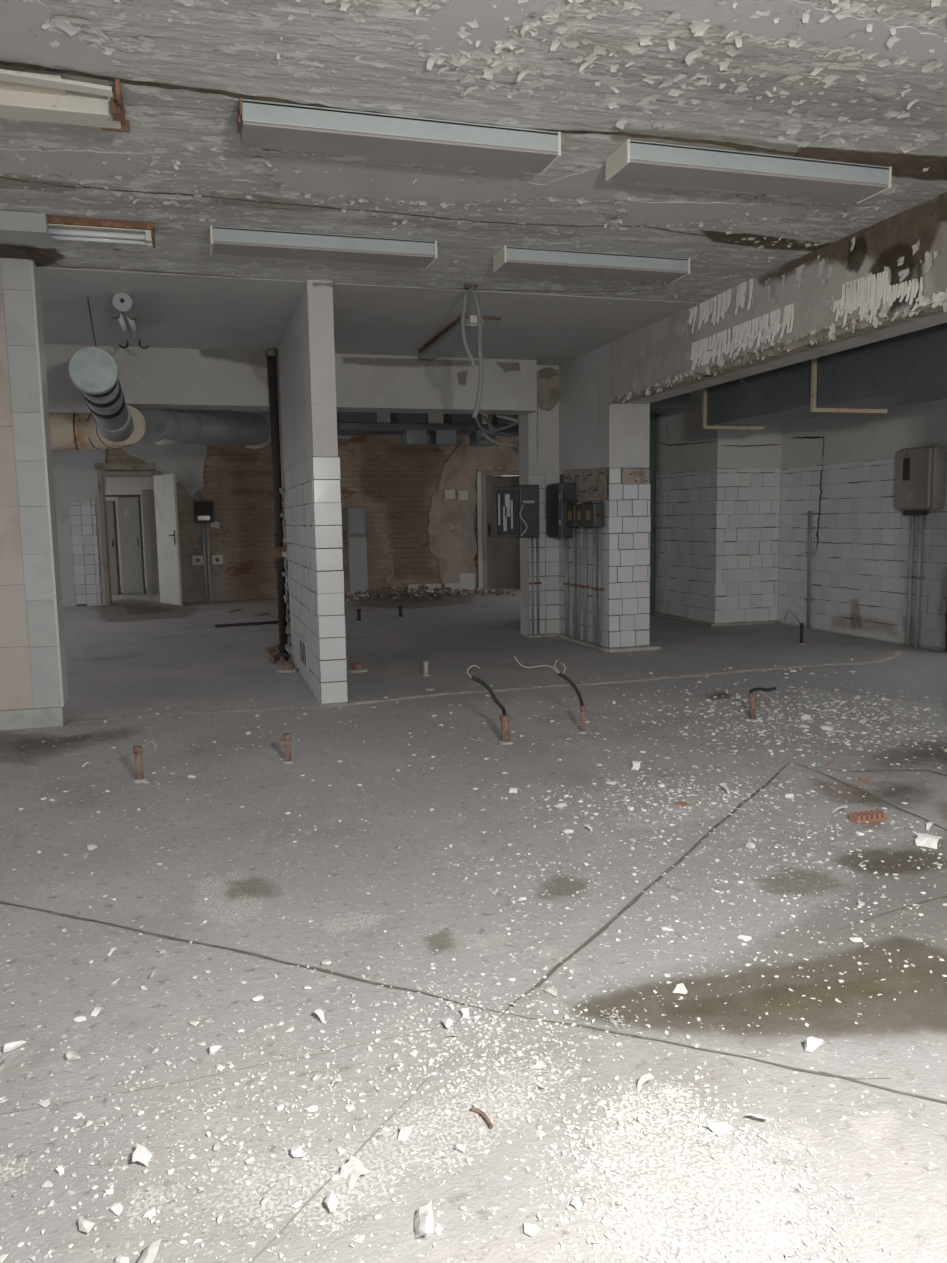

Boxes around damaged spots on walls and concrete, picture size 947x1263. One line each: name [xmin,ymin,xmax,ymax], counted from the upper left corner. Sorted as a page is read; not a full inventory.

peeling [0,0,296,73]
peeling [292,0,947,153]
peeling [0,125,655,248]
crack [0,177,832,251]
spalling [598,185,947,406]
leakage [760,192,947,312]
flaking render [407,573,475,593]
leakage [844,852,936,872]
crack [0,761,947,1263]
leakage [585,940,947,1031]